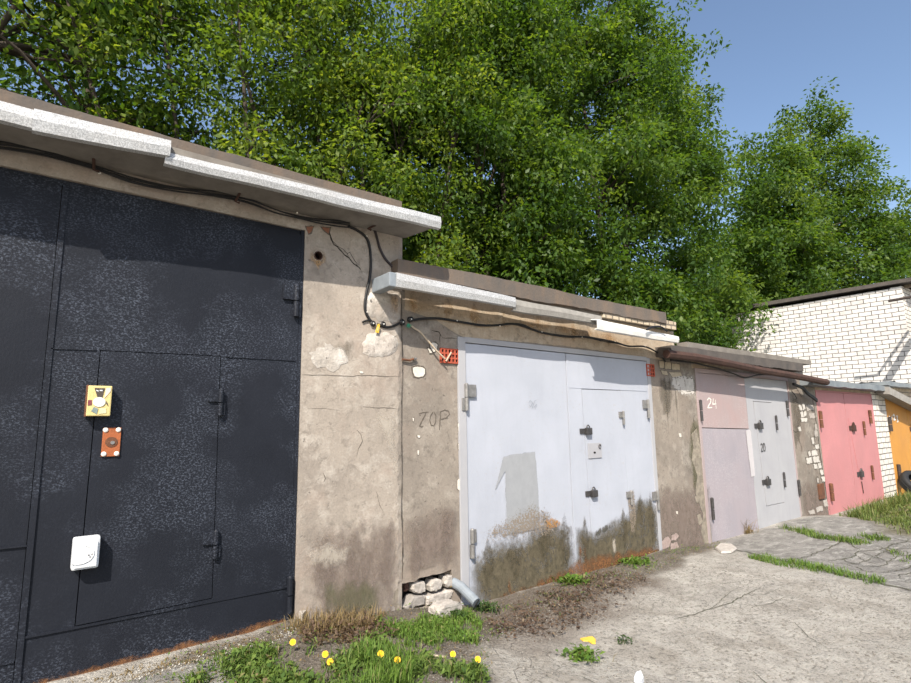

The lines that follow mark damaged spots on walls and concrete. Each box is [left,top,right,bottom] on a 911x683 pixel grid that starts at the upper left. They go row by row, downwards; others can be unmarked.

crack [329,232,361,270]
flaking render [658,360,694,392]
damp [661,375,695,411]
flaking render [797,403,825,484]
spalling [808,498,828,515]
corrosion [538,547,659,586]